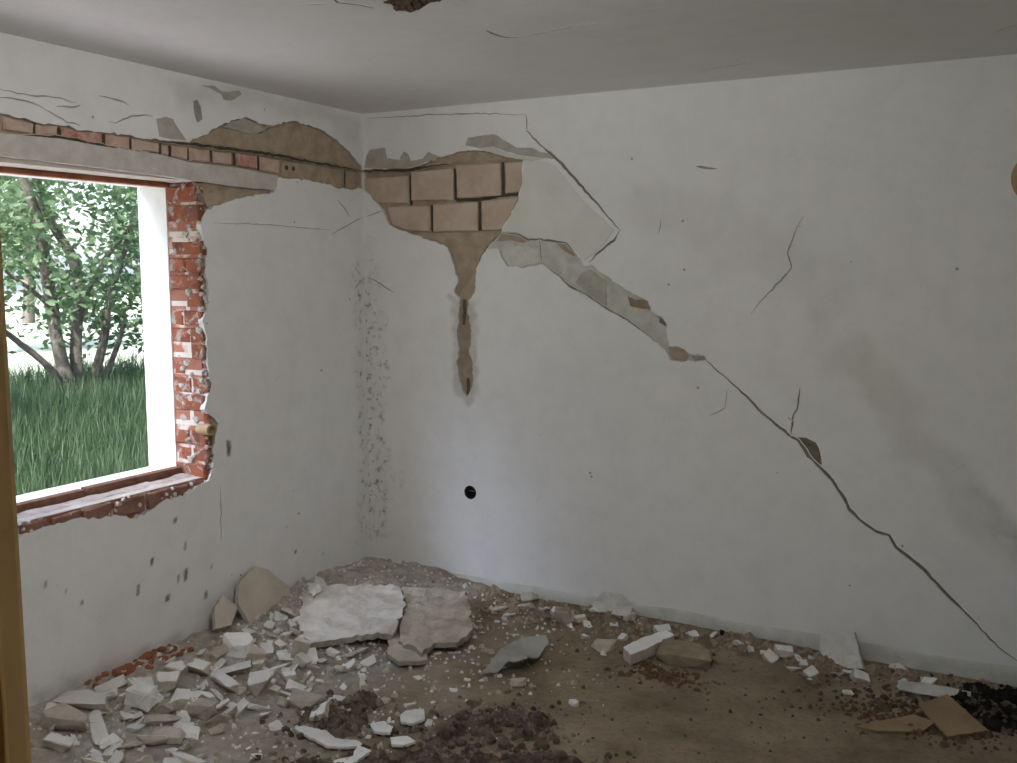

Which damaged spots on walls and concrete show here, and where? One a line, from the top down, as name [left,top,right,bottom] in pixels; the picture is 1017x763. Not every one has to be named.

peeling [193,100,202,123]
peeling [202,85,242,101]
crack [696,163,717,171]
spalling [0,114,707,395]
crack [750,216,804,314]
crack [706,360,1017,661]